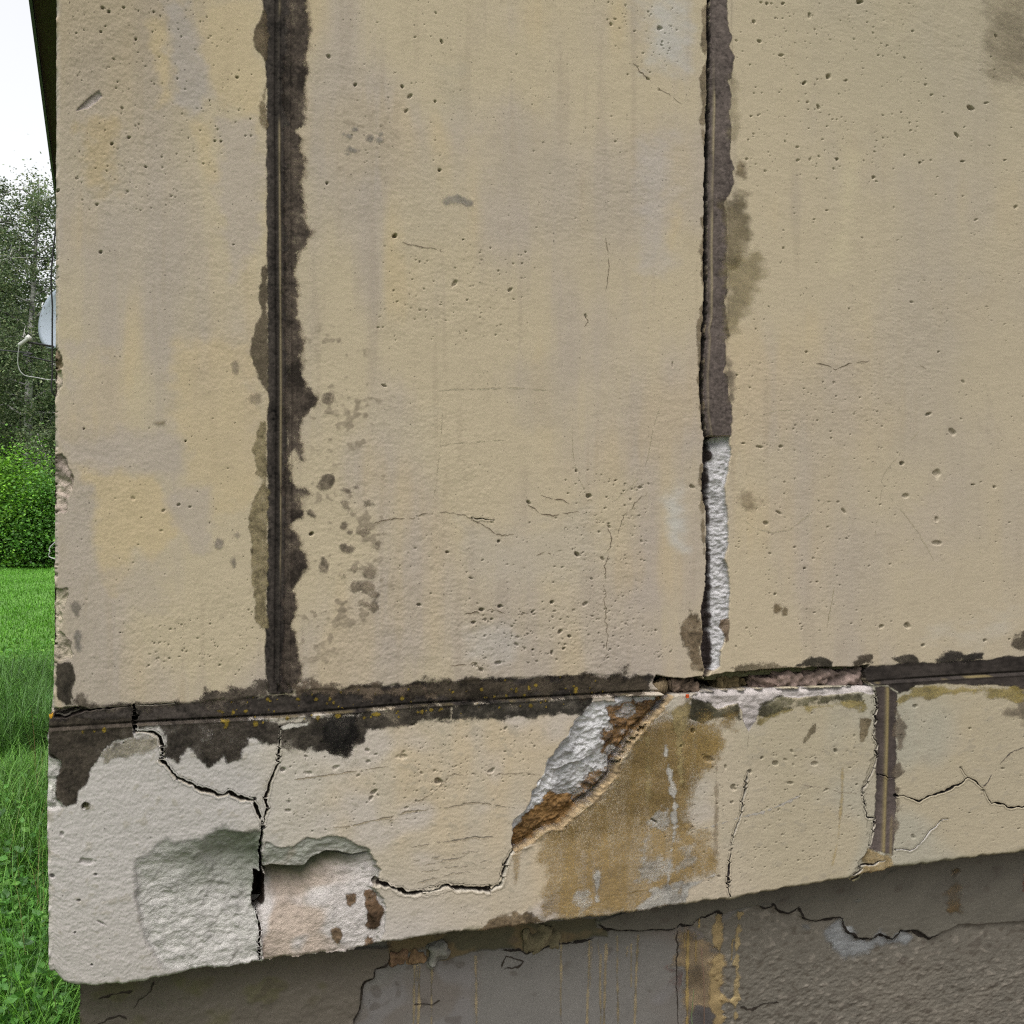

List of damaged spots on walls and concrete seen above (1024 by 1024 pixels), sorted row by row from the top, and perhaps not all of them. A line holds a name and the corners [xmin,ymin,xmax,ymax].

water stain [718,195,760,333]
water stain [48,0,650,807]
spalling [692,436,873,731]
crack [56,701,386,872]
spalling [135,828,386,970]
crack [376,836,516,899]
spalling [511,694,673,853]
crack [501,771,750,1024]
water stain [636,698,742,911]
water stain [757,693,871,742]
crack [760,903,940,940]
crack [848,692,1024,881]